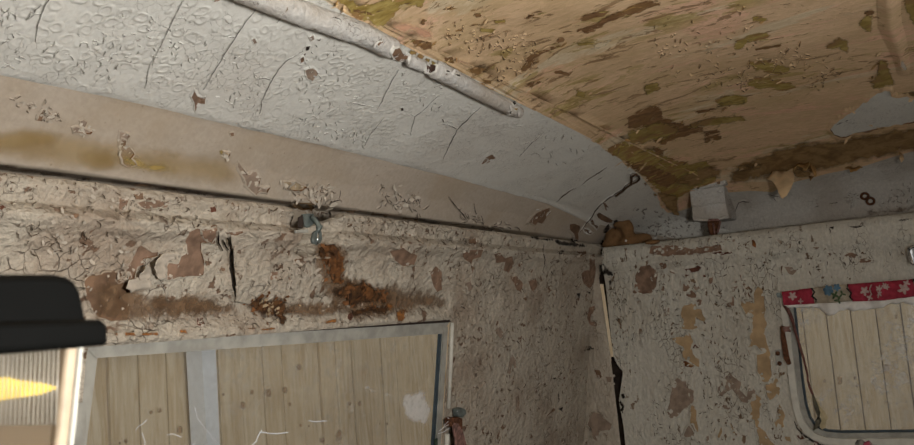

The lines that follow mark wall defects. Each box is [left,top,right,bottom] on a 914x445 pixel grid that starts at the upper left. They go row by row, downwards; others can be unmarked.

spalling [298,34,323,83]
spalling [373,38,411,66]
spalling [423,57,491,84]
crack [445,23,539,83]
peeling [696,77,796,114]
peeling [81,202,246,325]
rust [243,291,311,330]
rust [316,243,405,324]
crack [1,167,912,445]
peeling [558,202,615,329]
peeling [630,238,736,443]
peeling [716,274,818,445]